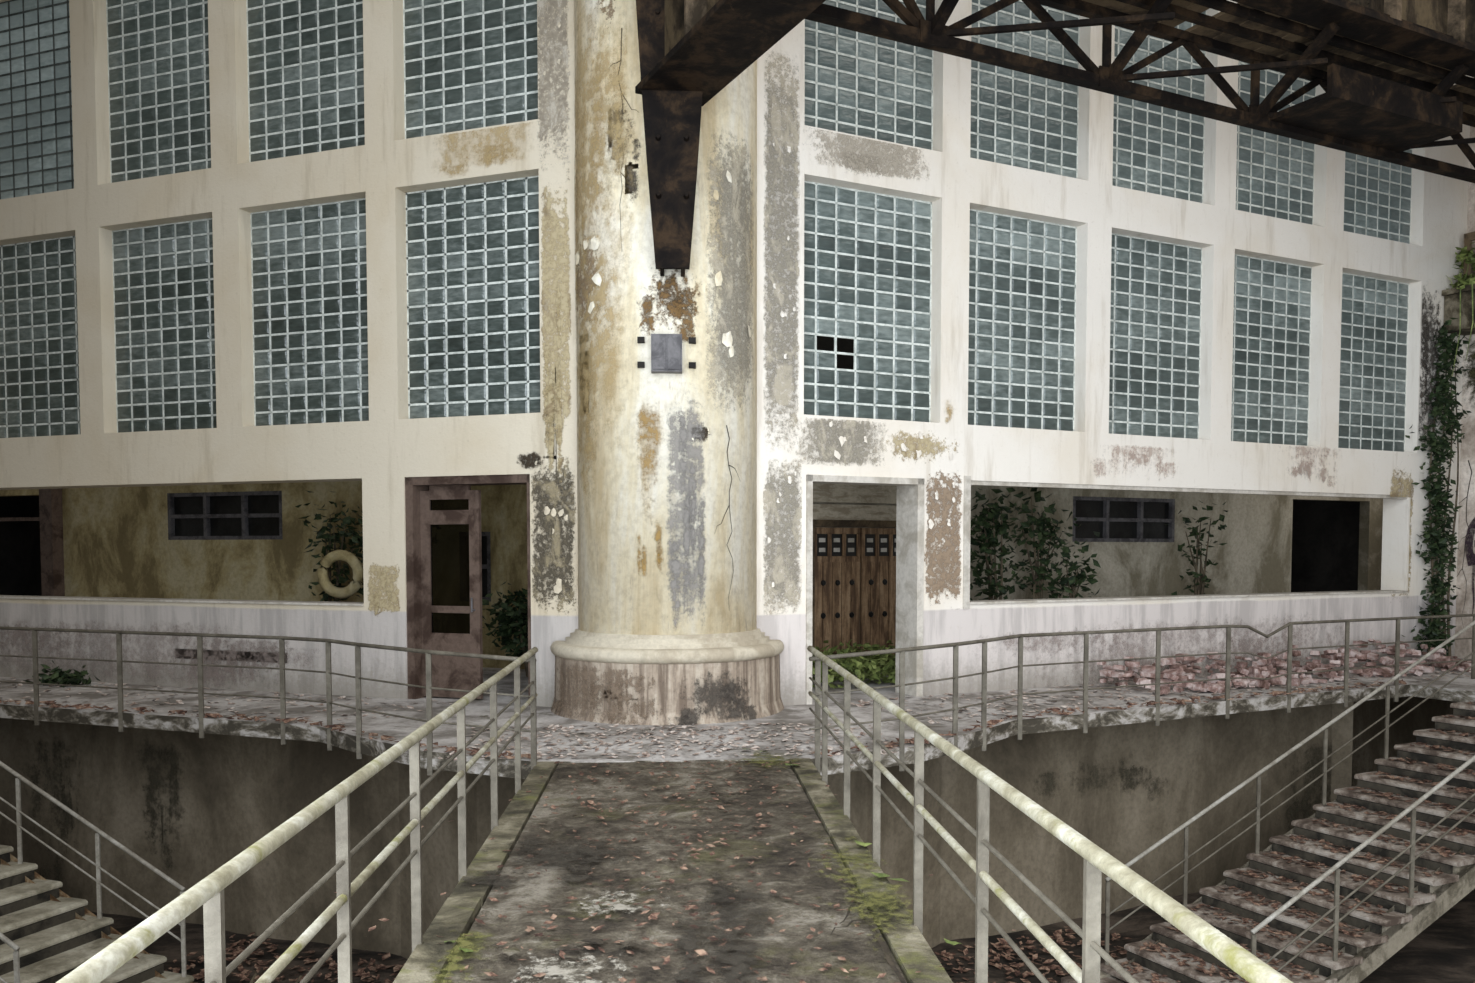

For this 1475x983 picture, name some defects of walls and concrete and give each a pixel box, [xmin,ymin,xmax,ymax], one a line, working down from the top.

peeling [518,178,602,612]
leakage [551,664,657,725]
leakage [574,35,640,459]
leakage [637,400,705,626]
leakage [676,671,757,725]
peeling [706,56,962,613]